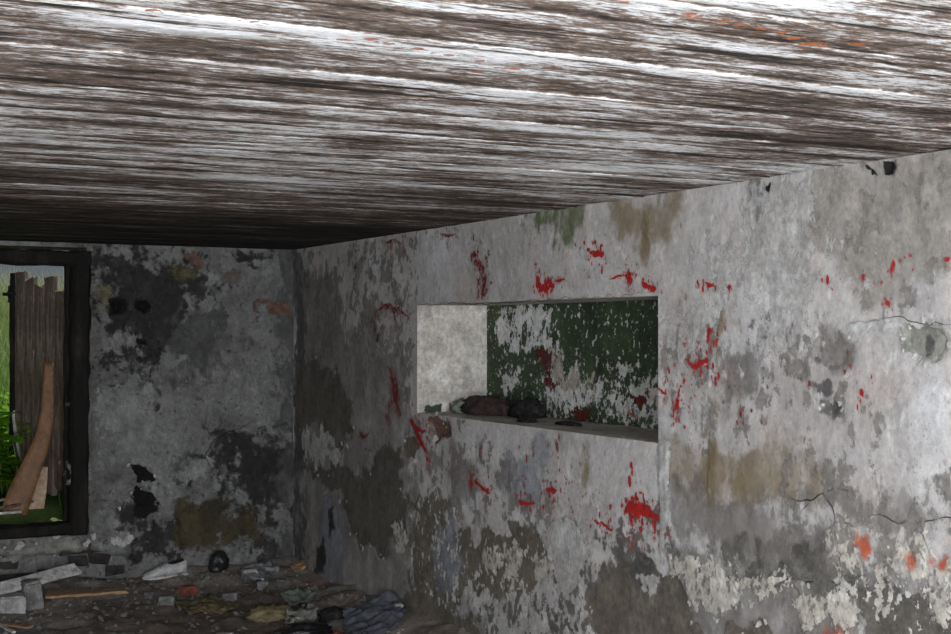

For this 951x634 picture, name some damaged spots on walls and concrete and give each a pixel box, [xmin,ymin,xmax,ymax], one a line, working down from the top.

peeling [852,279,875,314]
spalling [898,278,951,368]
leakage [78,244,419,600]
spalling [127,463,160,519]
leakage [667,443,951,634]
peeling [694,312,951,634]
crack [789,489,951,545]